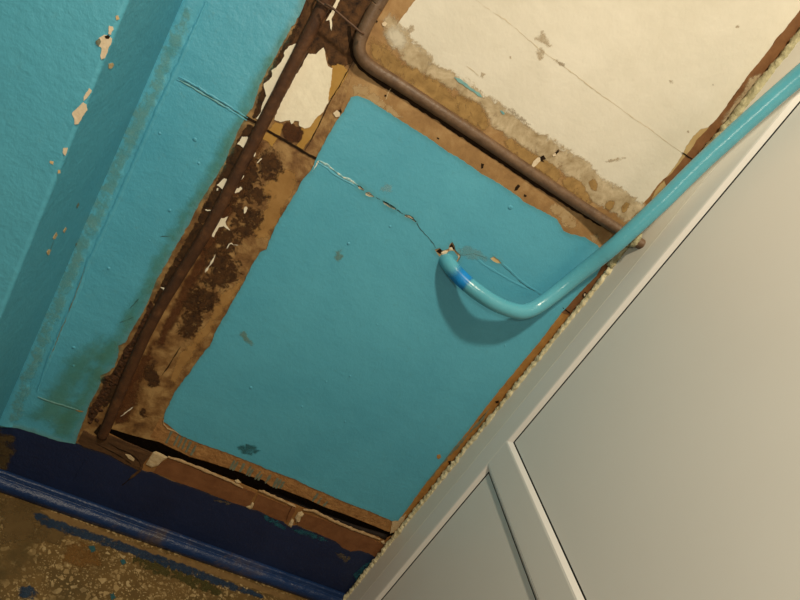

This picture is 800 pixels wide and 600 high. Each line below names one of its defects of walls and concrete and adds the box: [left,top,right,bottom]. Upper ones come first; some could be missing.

peeling [72,88,92,124]
peeling [76,12,302,445]
corrosion [88,0,317,424]
corrosion [291,0,372,83]
peeling [112,47,615,581]
leakage [353,84,403,118]
crack [177,26,601,248]
peeling [366,0,574,194]
leakage [371,14,709,222]
leakage [550,203,576,228]
crack [479,2,692,159]